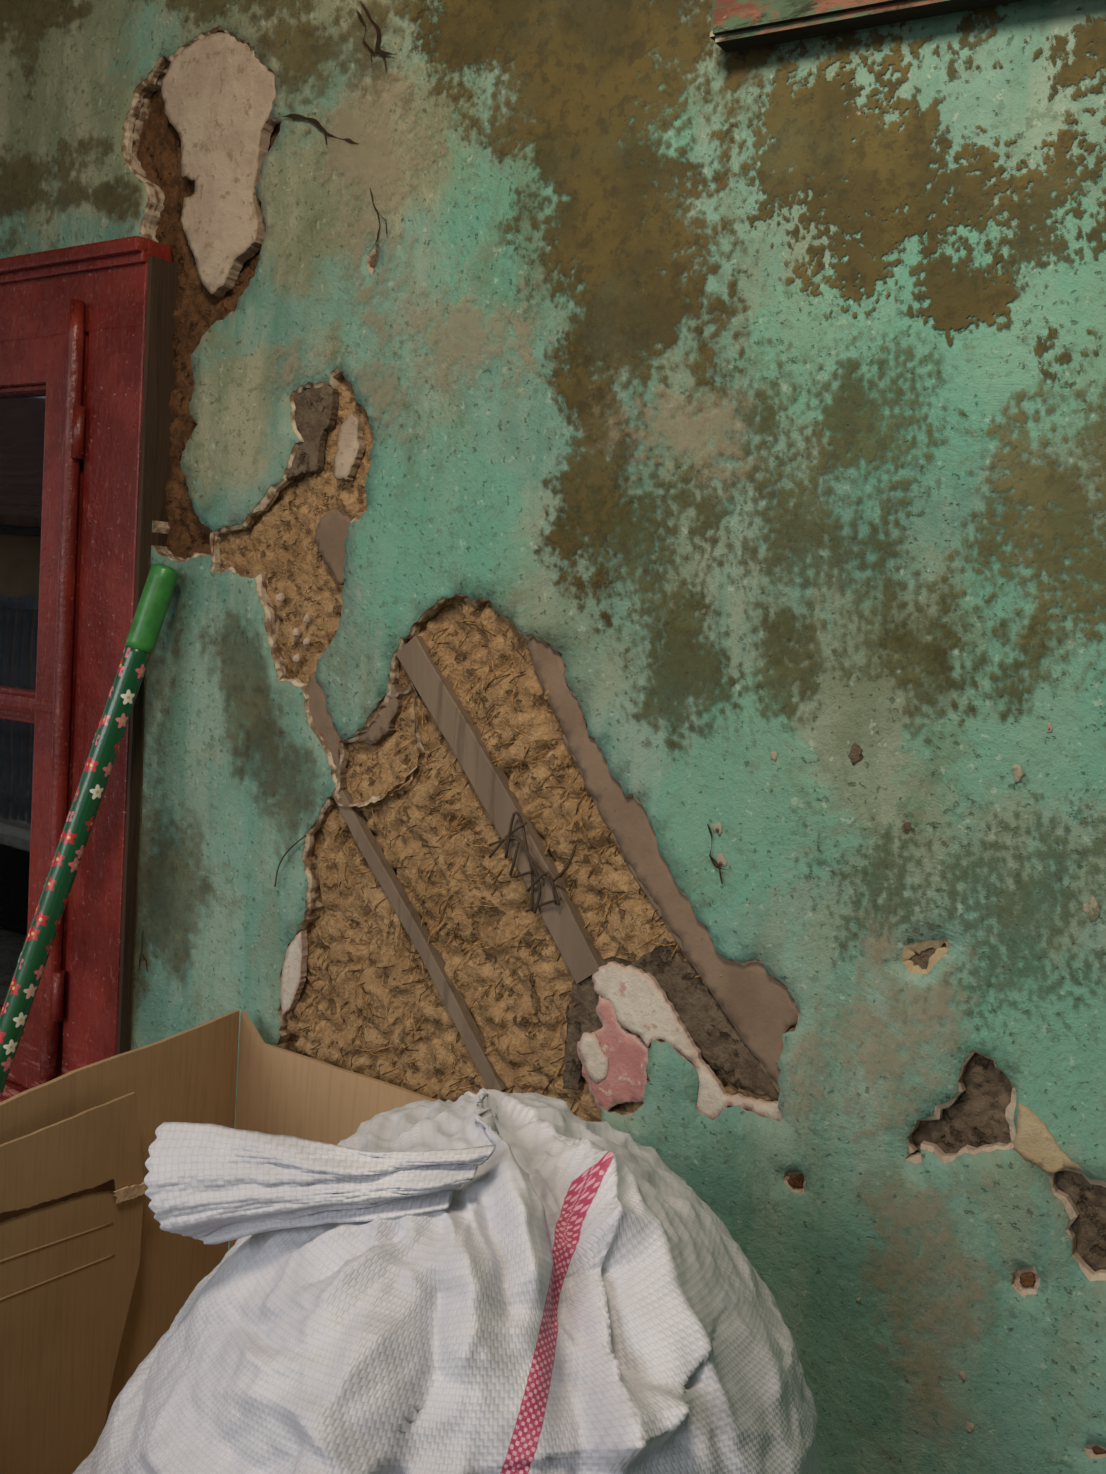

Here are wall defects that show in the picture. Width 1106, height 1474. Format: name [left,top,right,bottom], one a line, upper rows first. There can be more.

damp [402,0,1106,760]
flaking render [122,26,800,1122]
flaking render [902,939,949,974]
flaking render [783,1171,806,1193]
flaking render [904,1049,1106,1281]
flaking render [1011,1266,1040,1295]